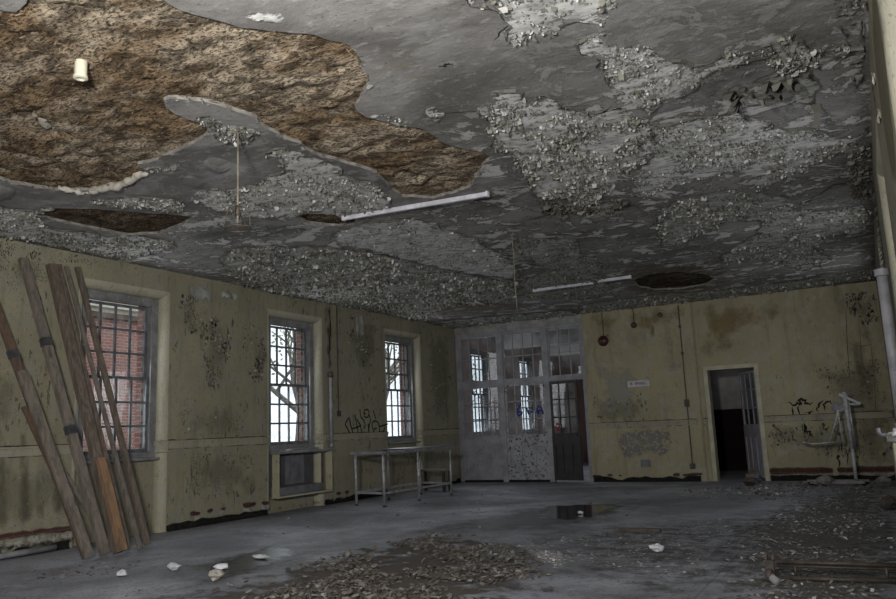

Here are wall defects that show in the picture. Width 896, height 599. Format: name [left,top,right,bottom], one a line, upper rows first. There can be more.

spalling [0,0,881,369]